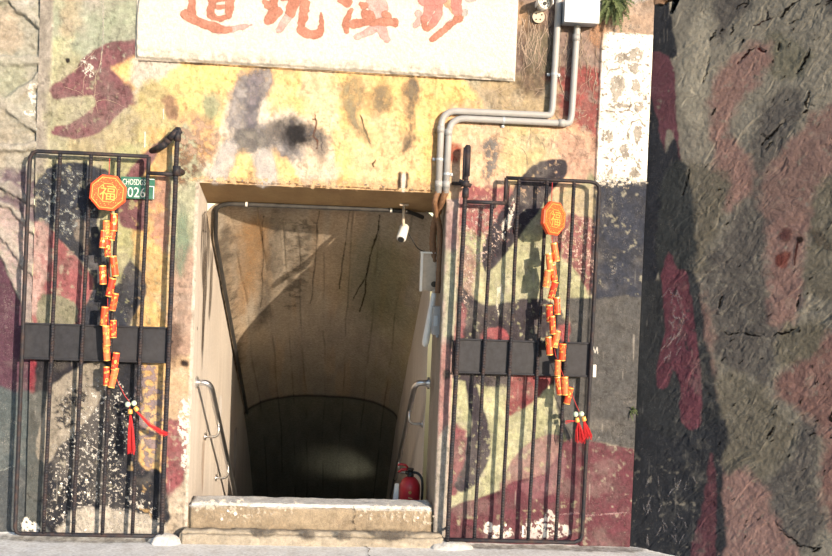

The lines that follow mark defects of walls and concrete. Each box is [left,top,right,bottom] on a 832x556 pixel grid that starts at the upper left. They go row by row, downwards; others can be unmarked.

water stain [209,69,327,186]
crack [209,180,432,192]
crack [360,115,376,167]
peeling [592,23,651,195]
water stain [201,213,234,359]
crack [339,215,380,311]